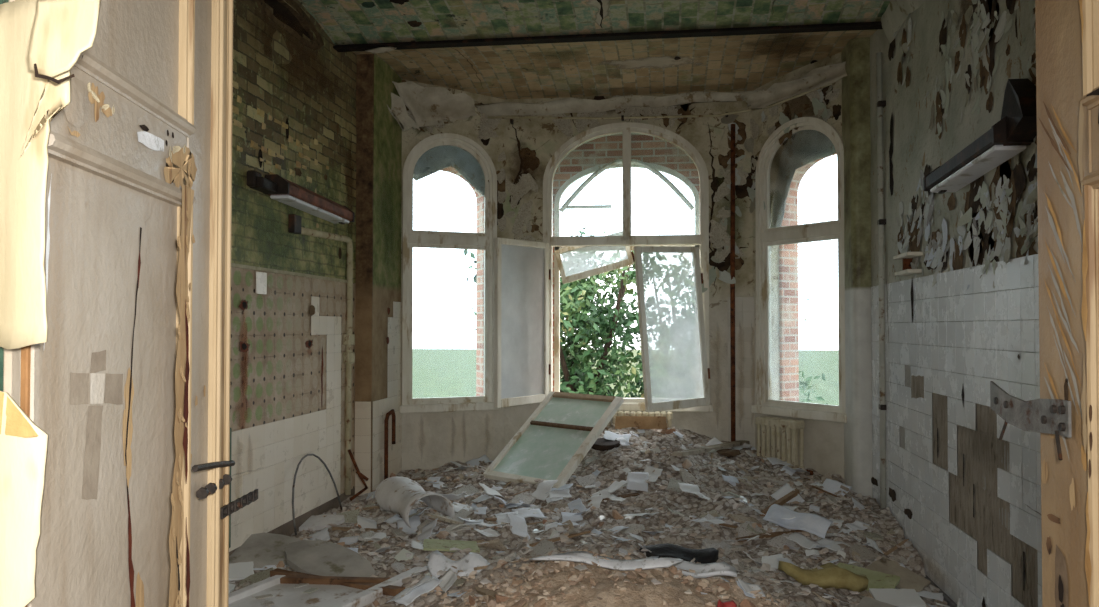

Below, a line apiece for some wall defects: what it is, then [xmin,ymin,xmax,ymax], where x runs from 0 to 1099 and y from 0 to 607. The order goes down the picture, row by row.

crack [589,0,609,28]
peeling [888,12,916,88]
peeling [923,0,1036,139]
peeling [701,85,841,293]
peeling [896,135,1038,288]
peeling [1078,88,1099,191]
peeling [1064,219,1093,477]
peeling [911,375,1068,607]
peeling [1069,478,1092,606]